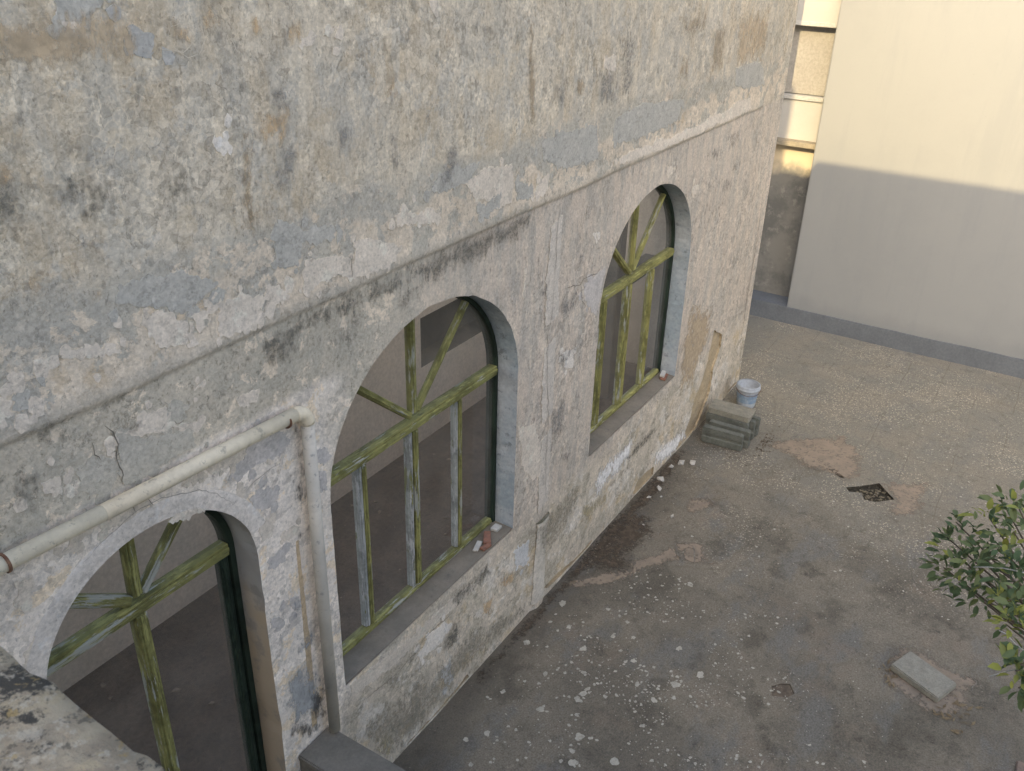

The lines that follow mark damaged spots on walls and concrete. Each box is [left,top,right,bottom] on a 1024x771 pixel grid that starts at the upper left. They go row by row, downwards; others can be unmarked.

peeling [615,53,765,165]
peeling [140,157,550,348]
damp [415,216,529,281]
peeling [544,215,563,326]
crack [92,426,124,484]
peeling [168,508,205,524]
peeling [518,336,577,487]
damp [542,431,653,544]
flaking render [633,330,722,497]